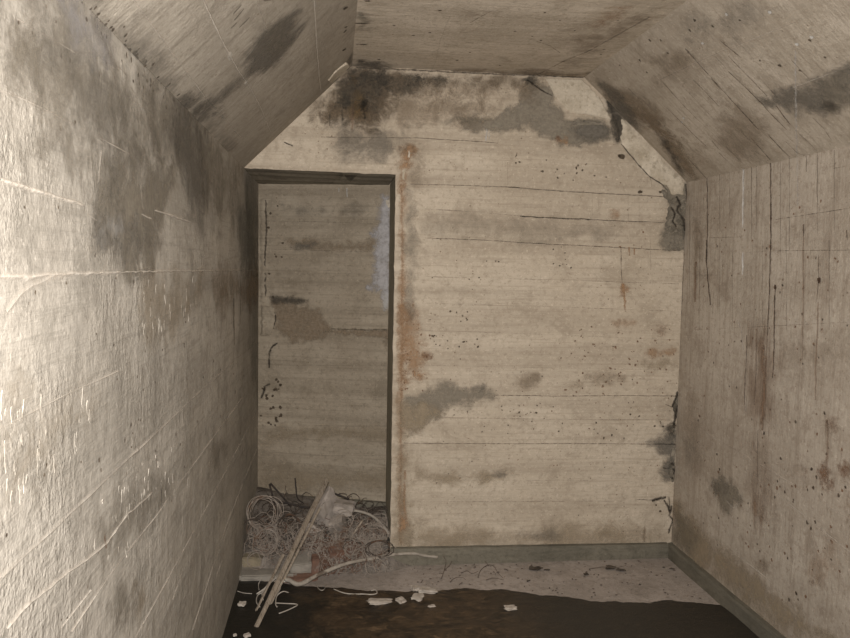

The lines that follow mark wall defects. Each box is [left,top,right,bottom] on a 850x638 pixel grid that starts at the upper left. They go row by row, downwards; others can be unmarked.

leakage [246,11,304,75]
leakage [316,59,590,155]
leakage [761,65,850,112]
leakage [9,3,226,283]
crack [457,144,665,197]
leakage [598,84,696,250]
spalling [659,184,687,251]
leakage [271,296,388,343]
leakage [401,382,494,430]
spalling [665,391,678,428]
leakage [714,476,741,514]